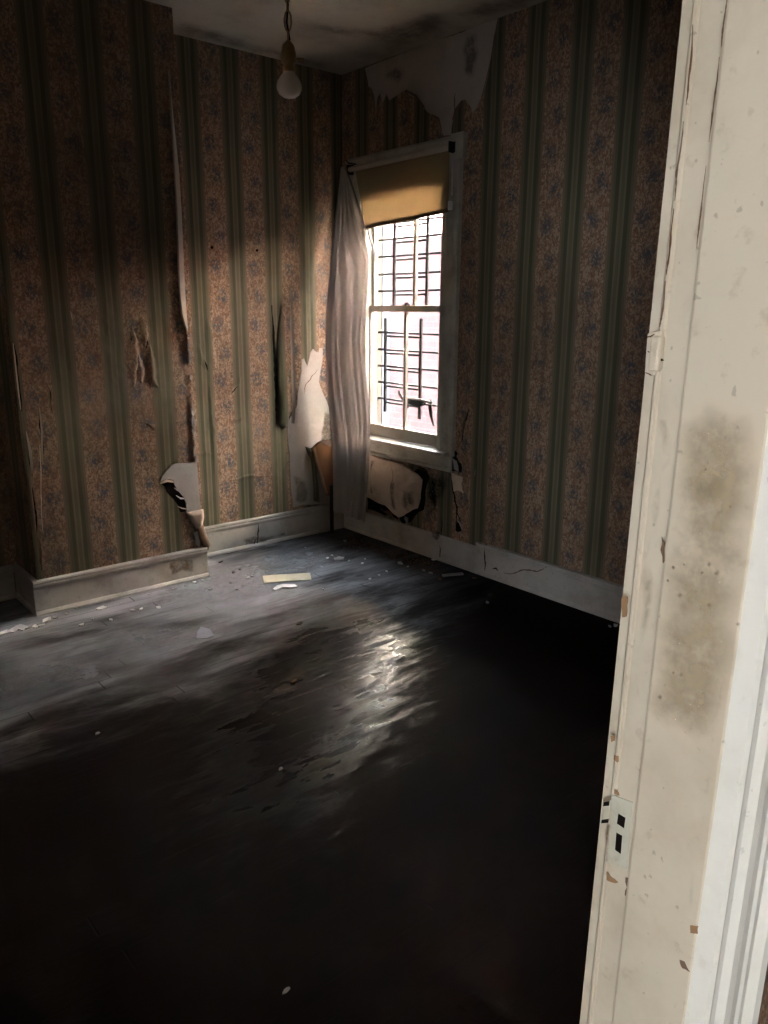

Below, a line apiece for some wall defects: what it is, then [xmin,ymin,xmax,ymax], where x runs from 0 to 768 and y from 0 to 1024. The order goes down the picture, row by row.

flaking render [365,19,497,136]
flaking render [168,69,188,330]
flaking render [287,348,332,507]
flaking render [159,462,211,550]
crack [484,548,547,574]